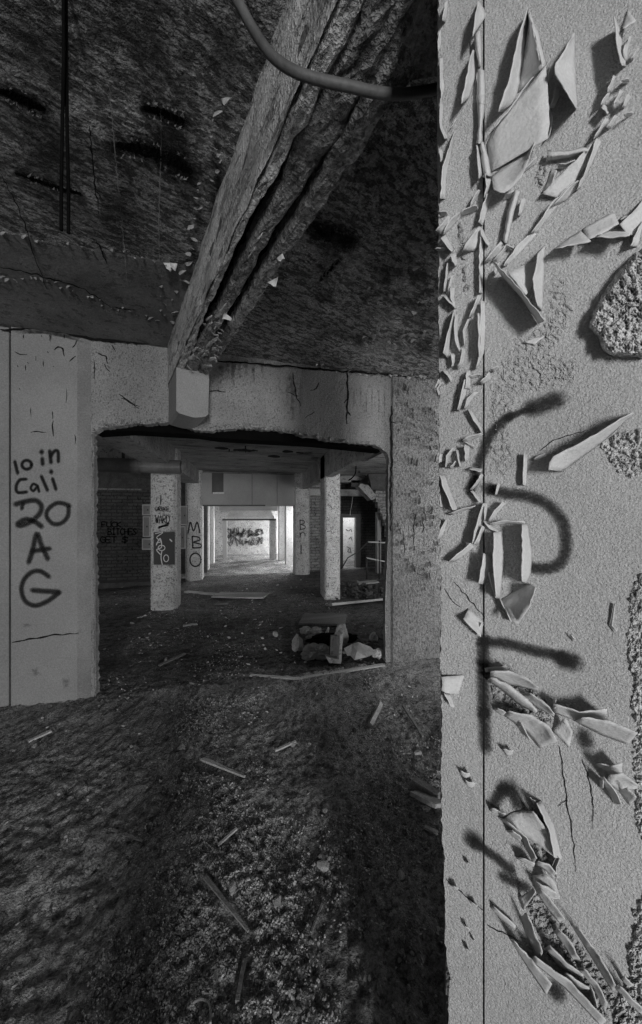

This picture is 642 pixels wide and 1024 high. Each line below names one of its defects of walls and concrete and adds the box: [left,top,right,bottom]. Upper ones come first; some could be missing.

spalling [0,97,230,324]
crack [217,360,416,424]
peeling [308,0,642,659]
crack [12,633,78,643]
spalling [484,573,642,840]
flaking render [490,797,642,1024]
crack [559,747,594,872]